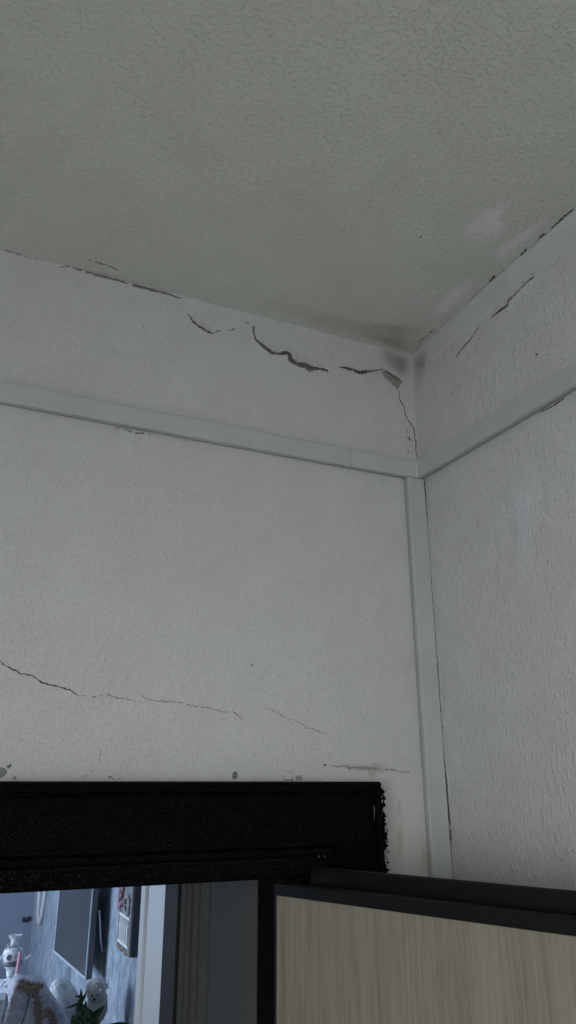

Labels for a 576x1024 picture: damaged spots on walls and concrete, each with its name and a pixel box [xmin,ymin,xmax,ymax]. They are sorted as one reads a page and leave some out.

crack [456,209,573,357]
crack [183,310,381,378]
crack [0,661,241,719]